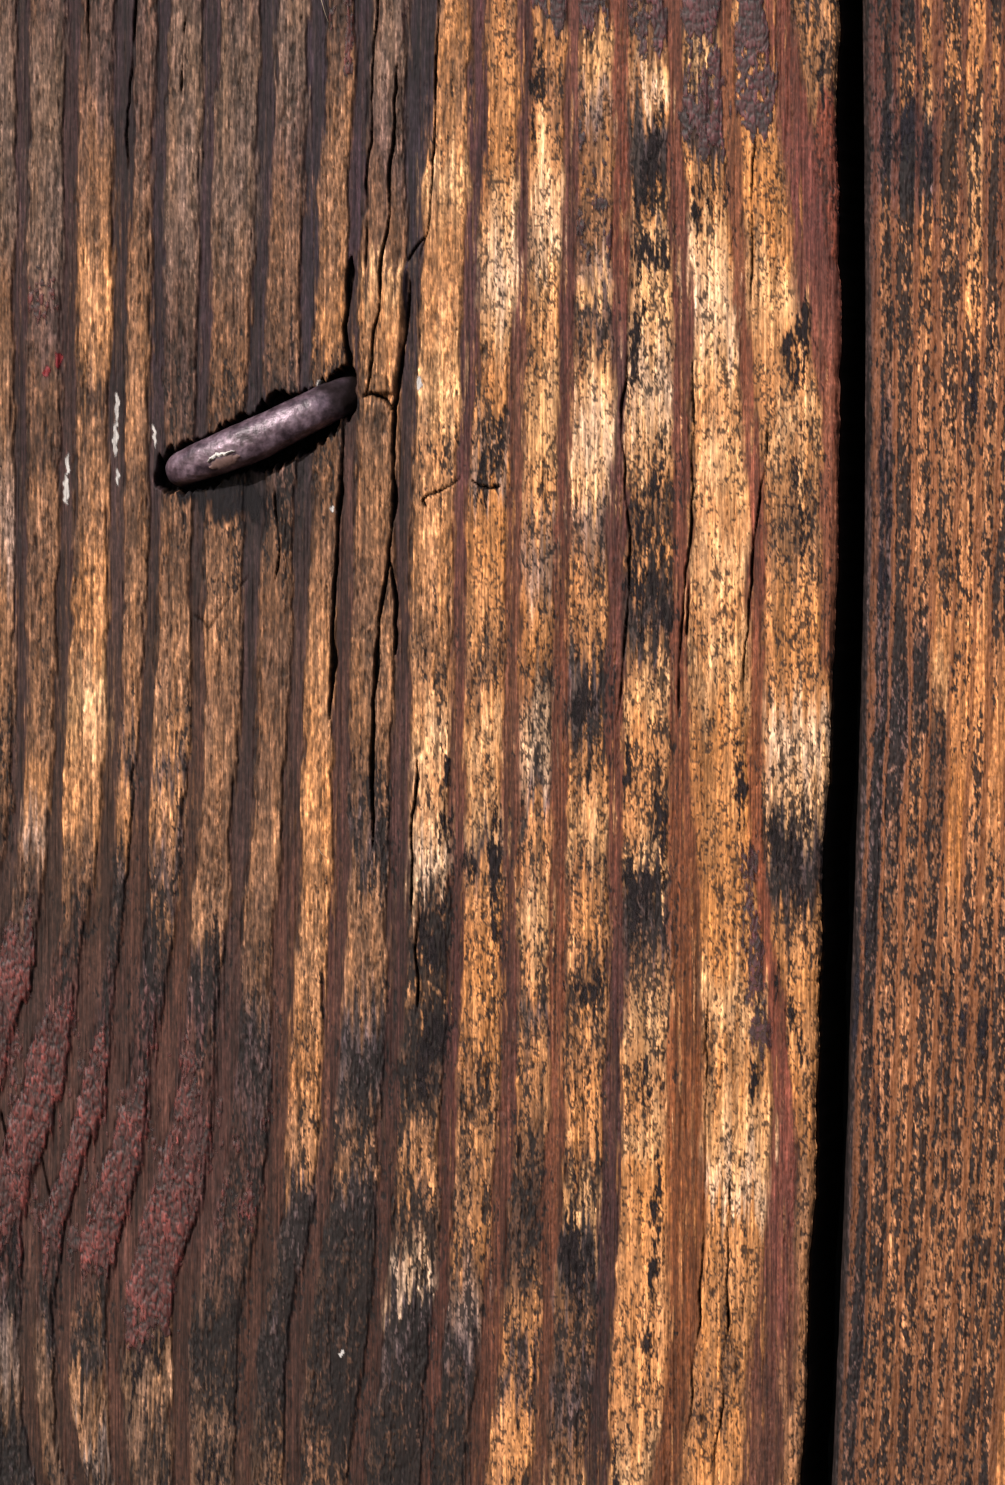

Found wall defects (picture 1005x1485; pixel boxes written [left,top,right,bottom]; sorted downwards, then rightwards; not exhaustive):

peeling [531,0,611,39]
peeling [627,0,780,165]
crack [344,0,500,840]
crack [330,439,345,719]
crack [410,763,420,1007]
peeling [0,895,265,1352]